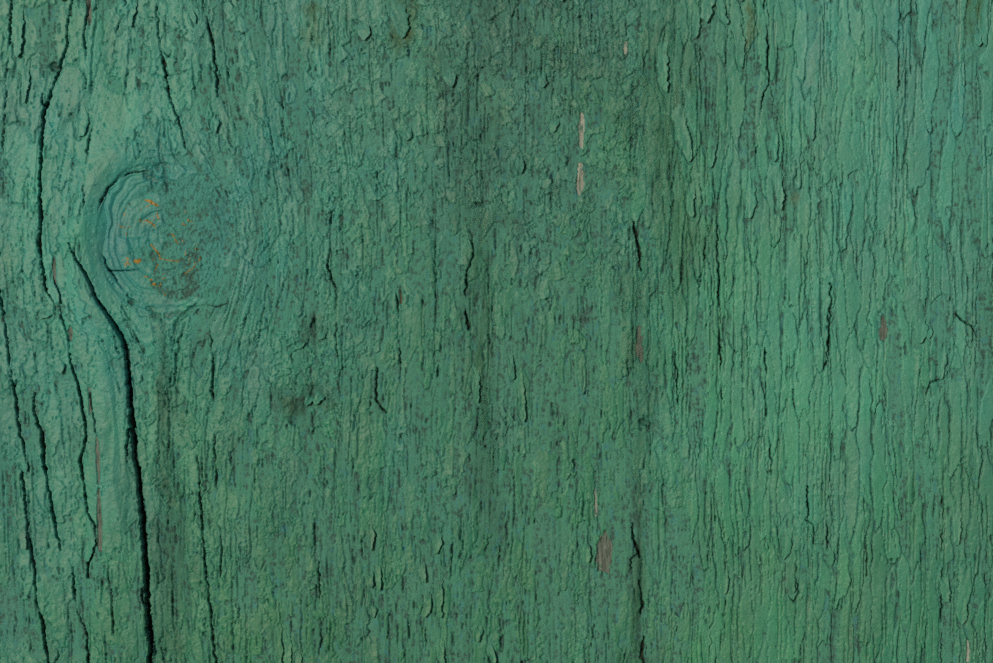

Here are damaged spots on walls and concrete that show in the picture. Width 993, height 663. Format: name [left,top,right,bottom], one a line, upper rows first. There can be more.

crack [209,27,219,86]
crack [38,60,63,291]
peeling [577,163,585,196]
crack [633,227,641,268]
crack [73,370,110,593]
crack [87,249,154,663]
crack [13,385,58,653]
peeling [581,530,613,573]
crack [638,640,646,662]